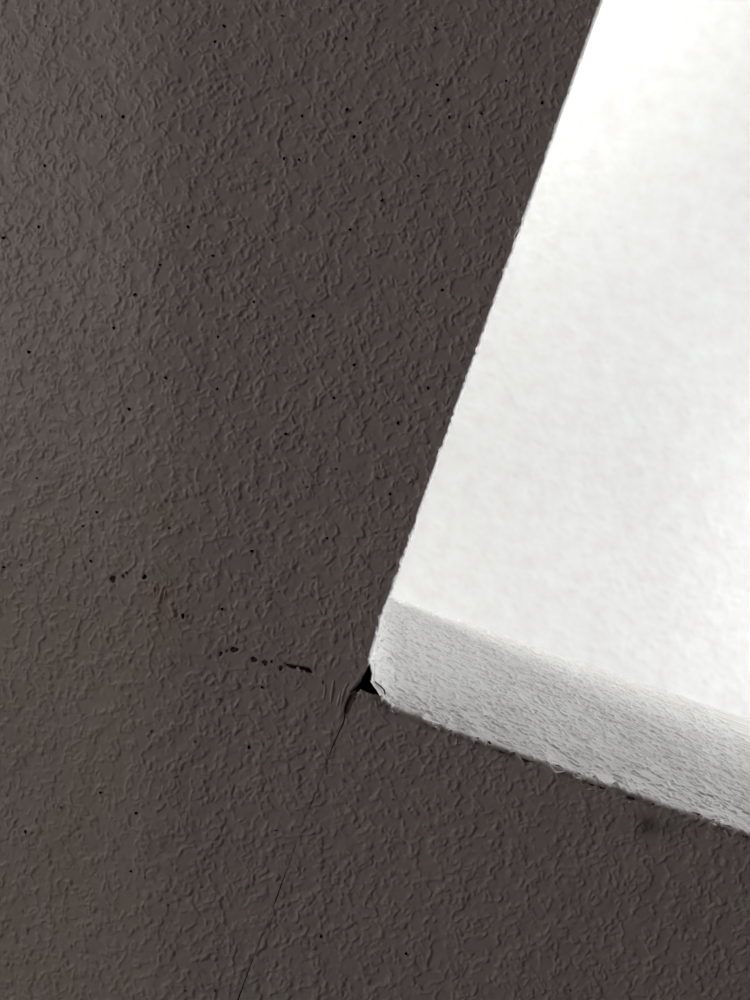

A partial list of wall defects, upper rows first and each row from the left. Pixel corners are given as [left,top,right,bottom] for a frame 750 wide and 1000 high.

crack [238,716,346,1000]